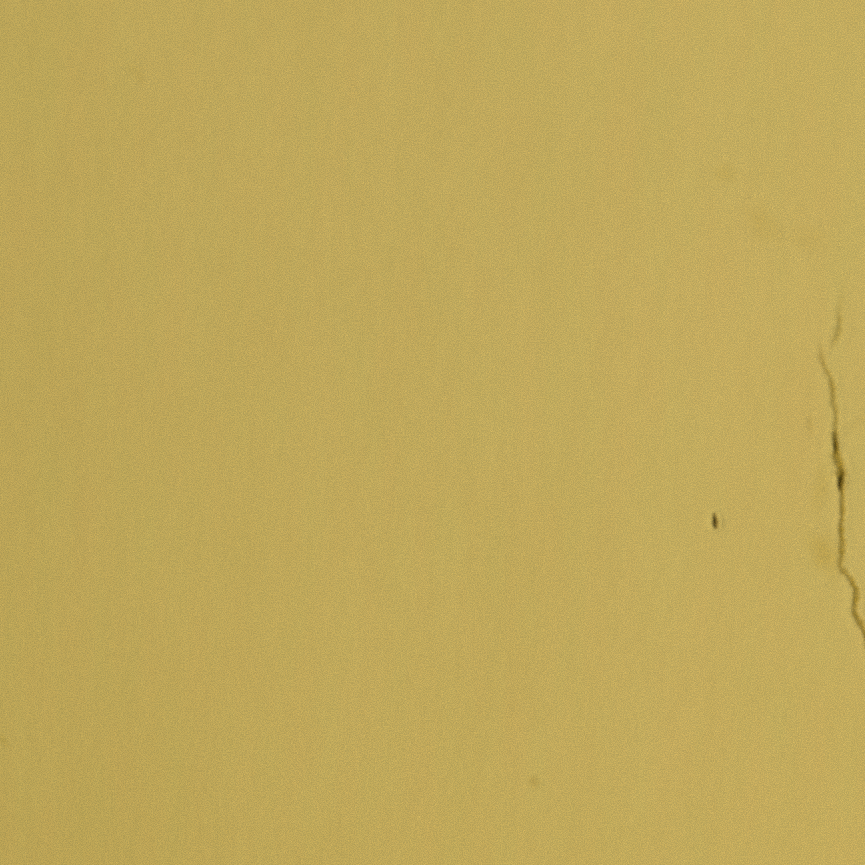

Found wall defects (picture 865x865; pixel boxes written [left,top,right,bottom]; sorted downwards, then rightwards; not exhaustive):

crack [833,433,845,556]
crack [851,579,865,635]